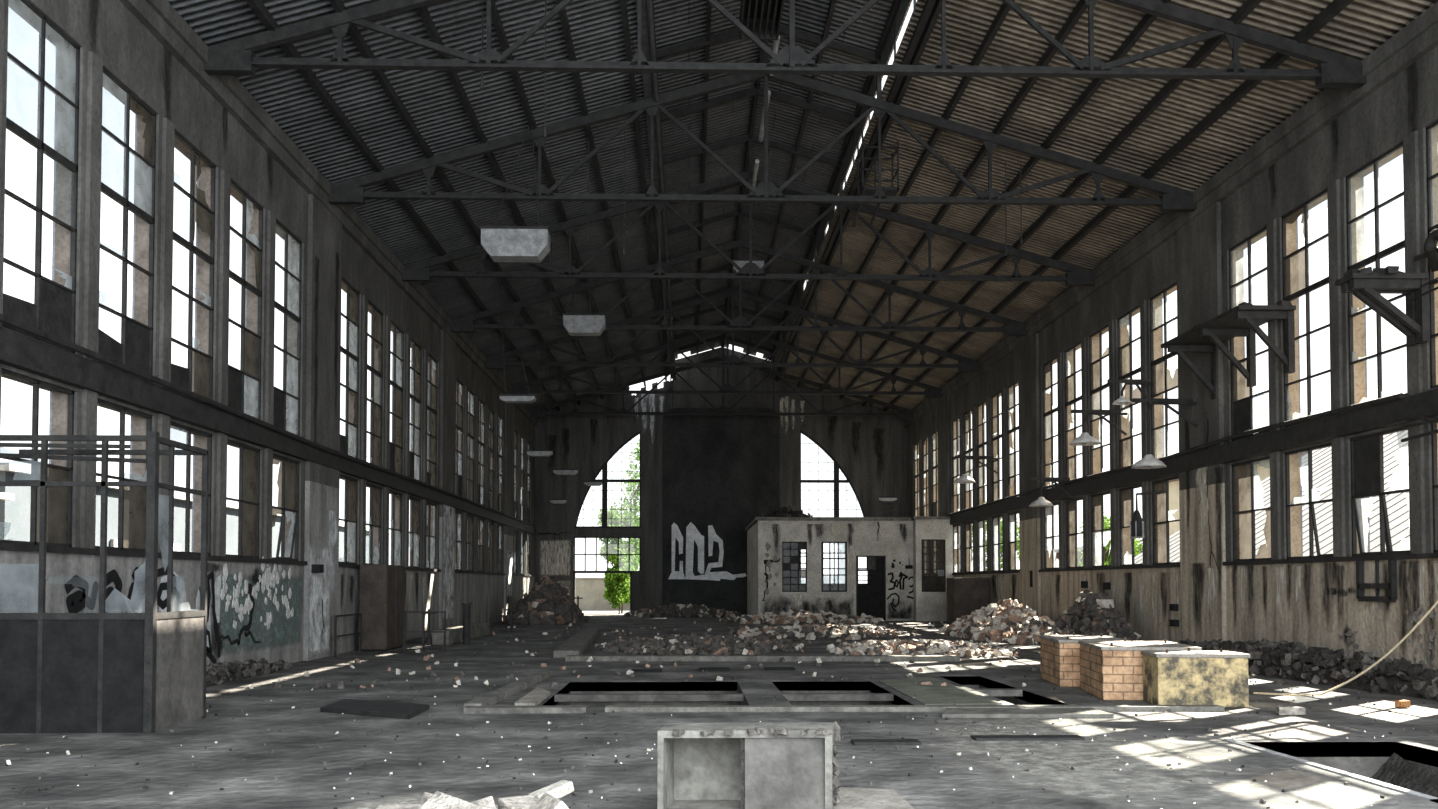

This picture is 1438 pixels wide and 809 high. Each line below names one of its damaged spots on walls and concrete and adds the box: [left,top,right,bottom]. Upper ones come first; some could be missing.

damp [1371,561,1438,653]